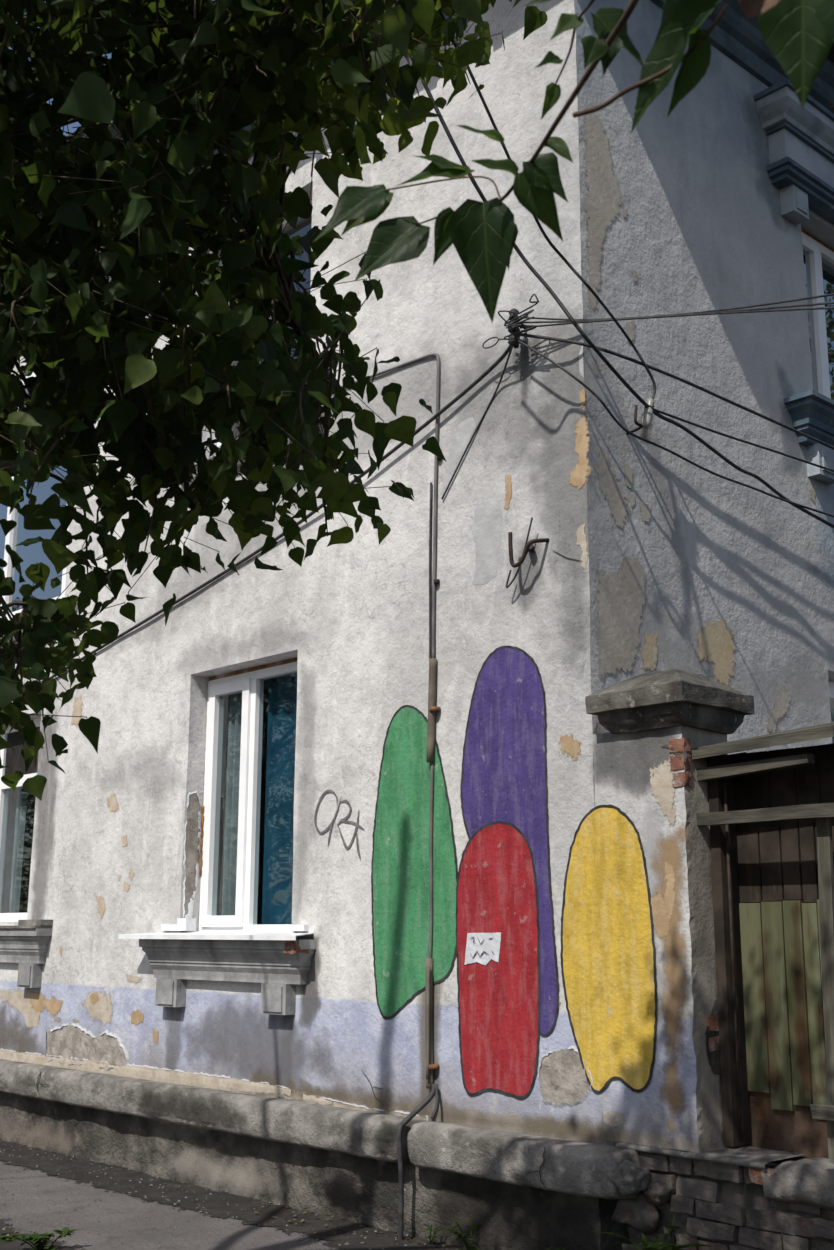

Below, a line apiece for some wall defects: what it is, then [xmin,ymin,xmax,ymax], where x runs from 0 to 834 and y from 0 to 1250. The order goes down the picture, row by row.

peeling [582,105,628,309]
peeling [566,388,651,528]
peeling [576,523,589,569]
peeling [697,618,737,686]
spalling [183,791,202,918]
peeling [0,987,428,1121]
spalling [538,1045,593,1108]